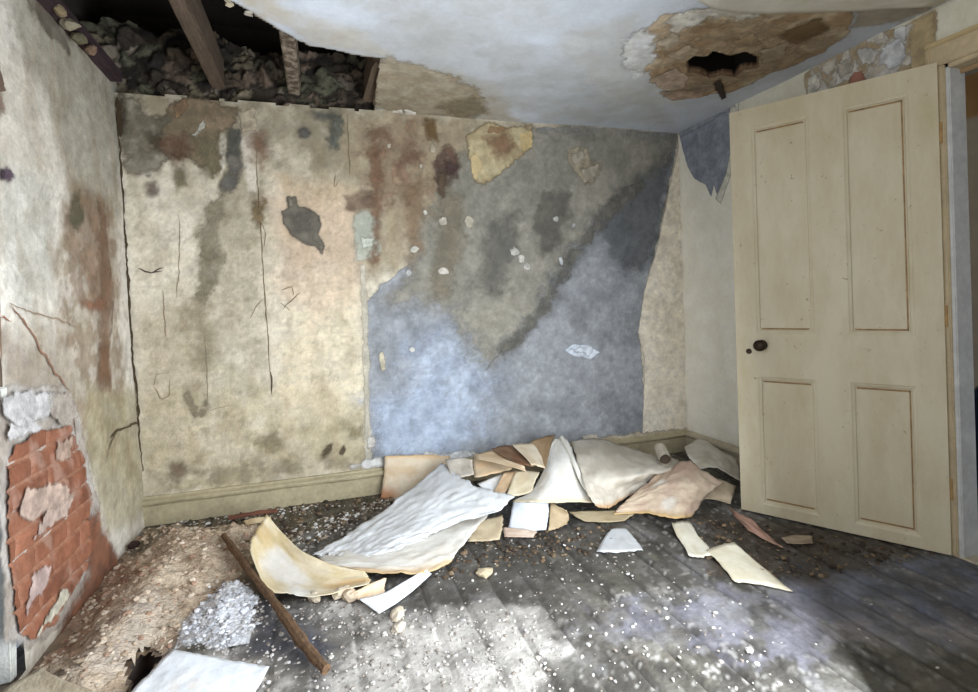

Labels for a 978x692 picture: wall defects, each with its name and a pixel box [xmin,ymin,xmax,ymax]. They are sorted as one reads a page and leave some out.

water stain [115,89,170,194]
spalling [155,96,257,179]
water stain [375,57,489,118]
peeling [466,122,534,185]
spalling [621,7,937,101]
crack [104,97,230,471]
water stain [196,129,243,305]
crack [250,130,273,393]
water stain [390,125,678,361]
crack [1,303,77,391]
peeling [565,344,600,359]
spalling [0,384,118,649]